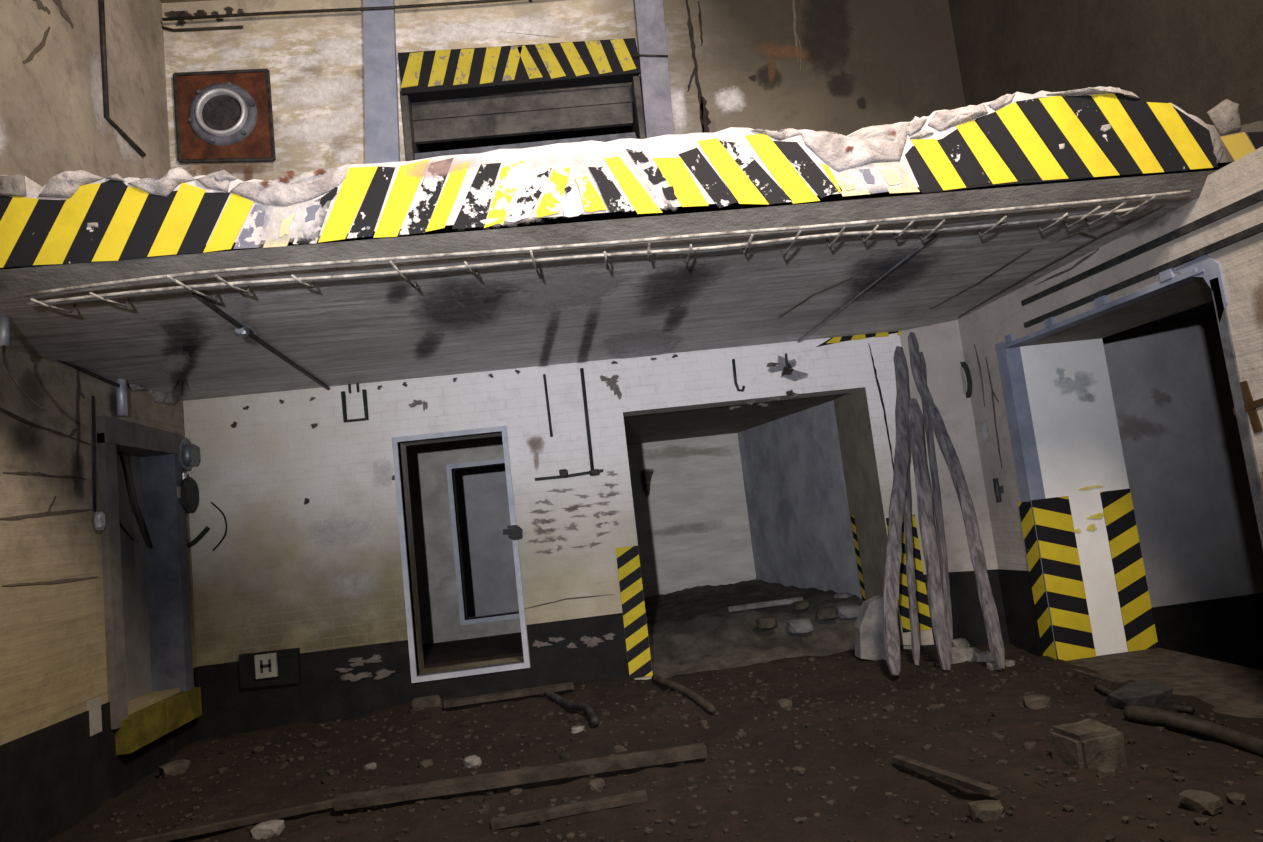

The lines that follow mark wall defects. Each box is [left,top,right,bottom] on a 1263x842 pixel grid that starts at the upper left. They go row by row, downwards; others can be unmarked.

crack [22,0,74,64]
flaking render [0,149,360,241]
peeling [452,160,634,229]
peeling [625,151,677,203]
crack [685,0,704,133]
flaking render [716,89,743,111]
flaking render [751,94,1015,192]
flaking render [1046,86,1141,100]
flaking render [1207,99,1241,163]
spalling [23,190,1191,313]
leakage [853,256,927,300]
peeling [529,471,619,553]